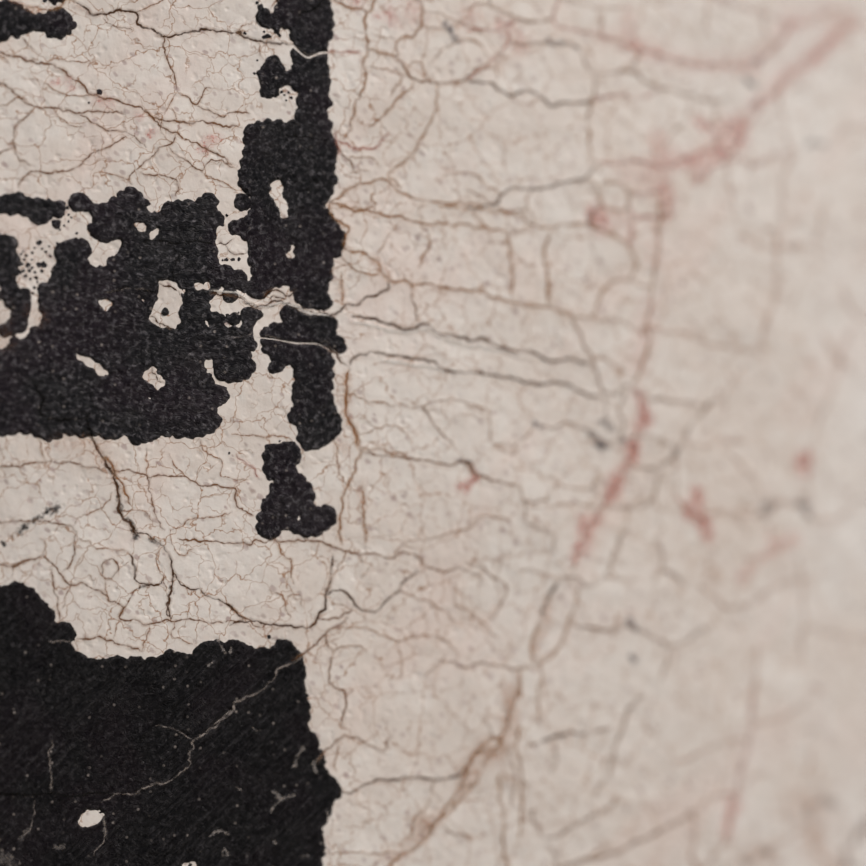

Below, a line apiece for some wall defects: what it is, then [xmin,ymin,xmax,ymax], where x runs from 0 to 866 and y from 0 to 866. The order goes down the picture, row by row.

crack [0,0,309,195]
peeling [0,0,347,540]
crack [106,239,244,293]
crack [212,0,755,486]
peeling [0,581,342,866]
crack [0,380,705,866]